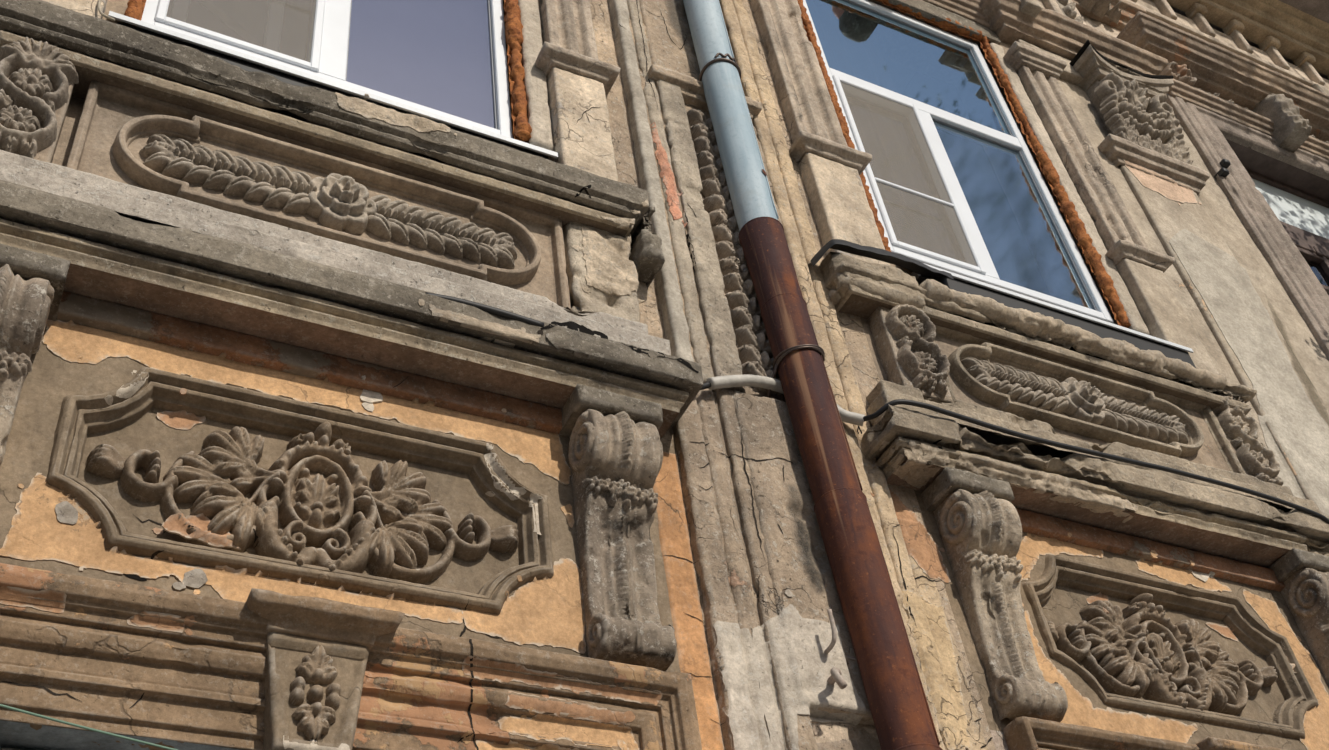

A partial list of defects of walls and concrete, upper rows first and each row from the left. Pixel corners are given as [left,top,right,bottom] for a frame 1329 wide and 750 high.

spalling [335,92,457,136]
flaking render [650,122,687,227]
peeling [42,319,571,535]
crack [689,432,796,556]
crack [893,524,942,627]
crack [457,601,501,750]
peeling [1022,603,1198,743]
peeling [1135,550,1329,750]